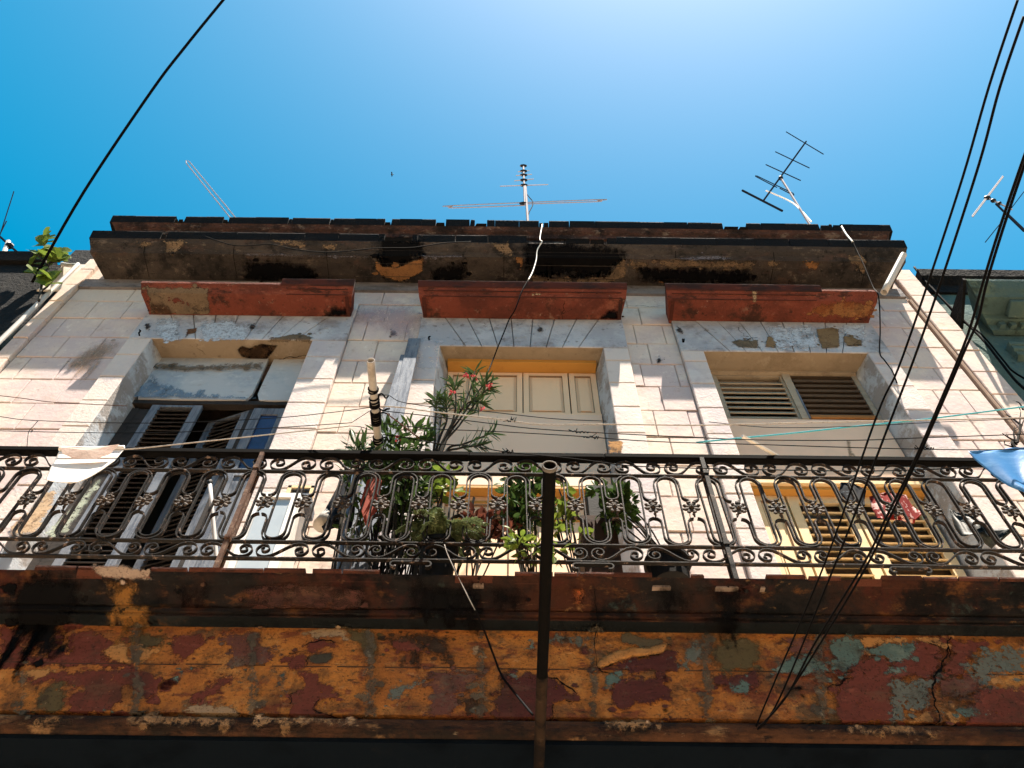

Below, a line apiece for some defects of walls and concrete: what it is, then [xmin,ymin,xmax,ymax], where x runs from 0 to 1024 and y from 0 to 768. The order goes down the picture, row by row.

damp [244,236,472,283]
flaking render [372,259,423,282]
damp [523,242,626,282]
damp [636,252,757,284]
flaking render [141,283,312,372]
peeling [732,297,877,351]
damp [0,570,88,679]
damp [239,583,369,610]
peeling [0,624,384,737]
peeling [422,632,692,732]
peeling [826,636,1024,738]
crack [908,637,952,726]